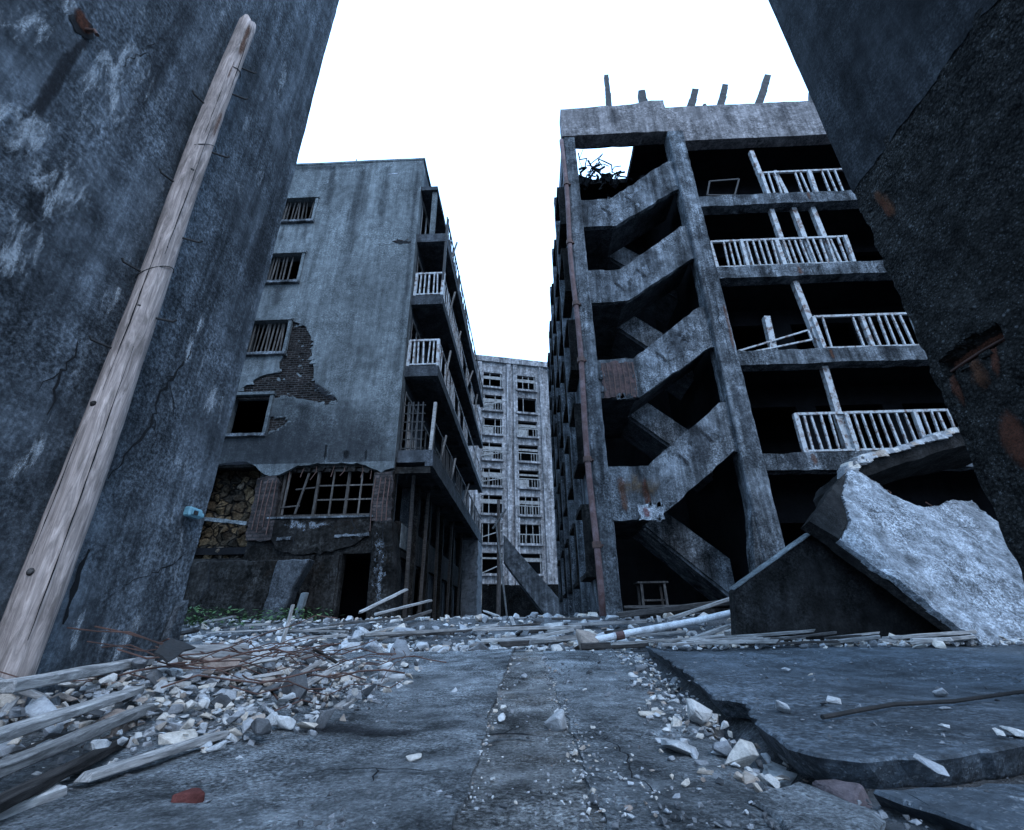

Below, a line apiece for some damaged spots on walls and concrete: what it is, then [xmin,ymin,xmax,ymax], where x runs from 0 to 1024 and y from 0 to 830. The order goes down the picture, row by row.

crack [38,341,78,415]
crack [108,343,193,479]
spalling [236,322,338,406]
spalling [637,501,669,523]
crack [62,549,90,624]